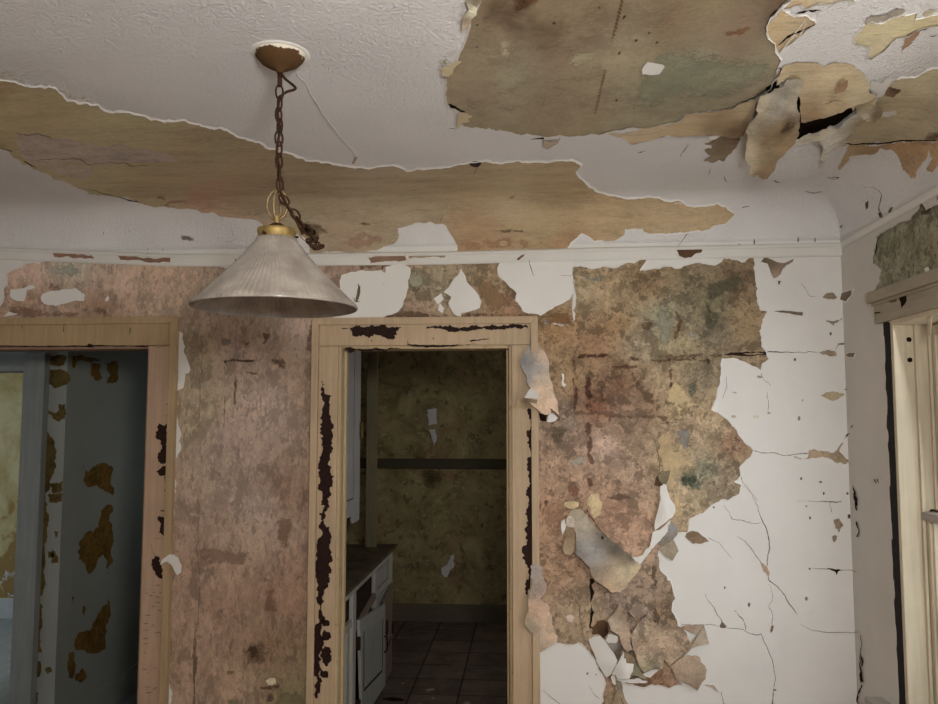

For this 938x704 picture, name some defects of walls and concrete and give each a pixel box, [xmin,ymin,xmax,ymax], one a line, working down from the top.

peeling [767,0,856,53]
peeling [852,9,938,62]
peeling [608,79,804,179]
peeling [845,67,938,145]
peeling [119,253,170,263]
peeling [677,249,702,258]
crack [754,425,853,465]
peeling [314,381,334,698]
peeling [514,341,560,652]
crack [813,479,879,537]
peeling [561,470,721,704]
crack [682,477,863,704]